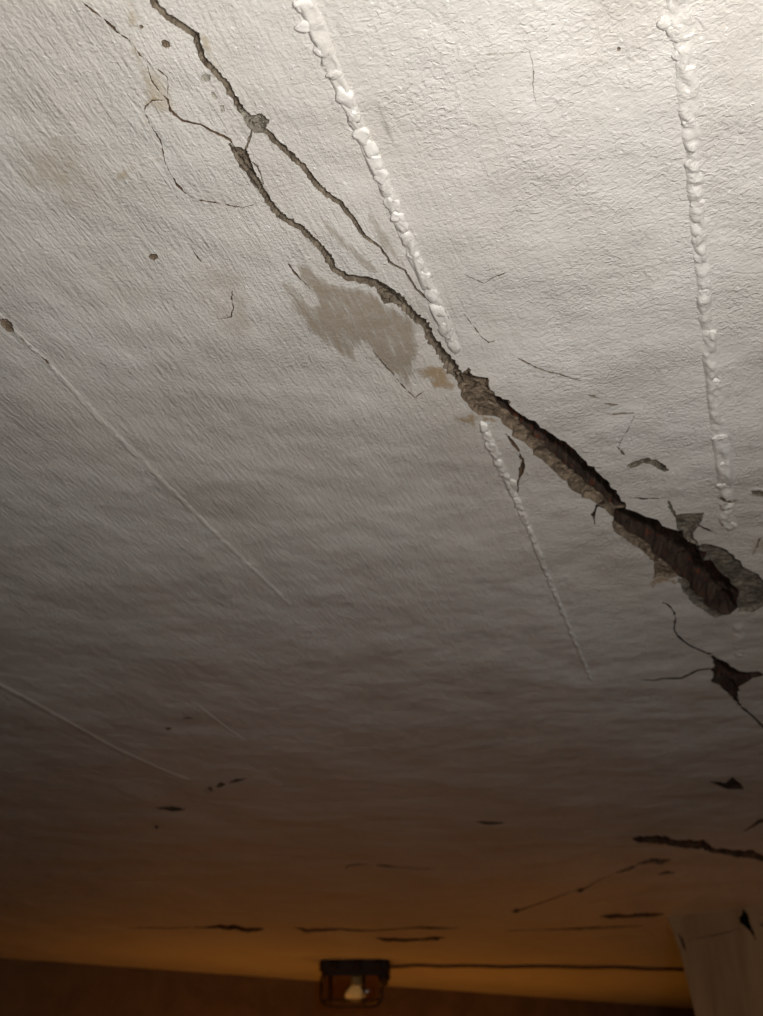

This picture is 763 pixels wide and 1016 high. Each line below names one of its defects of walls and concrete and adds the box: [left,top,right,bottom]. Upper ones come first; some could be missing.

peeling [293,0,460,354]
crack [80,0,763,618]
spalling [616,446,669,472]
peeling [479,421,593,681]
spalling [641,602,763,728]
crack [207,778,246,791]
spalling [709,777,743,789]
crack [127,924,264,932]
crack [295,926,459,942]
crack [511,819,763,931]